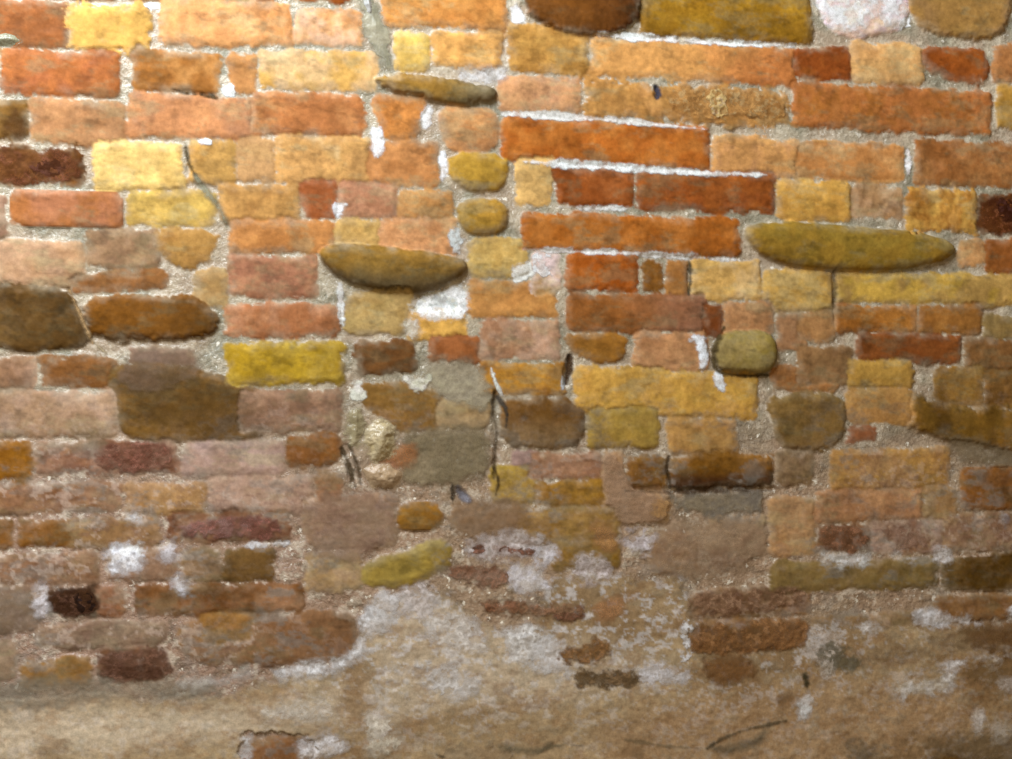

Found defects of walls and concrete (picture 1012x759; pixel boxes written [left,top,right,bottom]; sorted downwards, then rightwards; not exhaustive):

crack [185,149,227,225]
crack [492,389,508,491]
crack [341,445,361,480]
water stain [246,540,290,549]
efflorescence [467,531,556,594]
water stain [33,586,48,617]
efflorescence [279,584,485,676]
efflorescence [505,625,571,676]
efflorescence [680,619,694,661]
efflorescence [896,661,963,700]
water stain [798,695,812,718]
efflorescence [300,736,344,759]